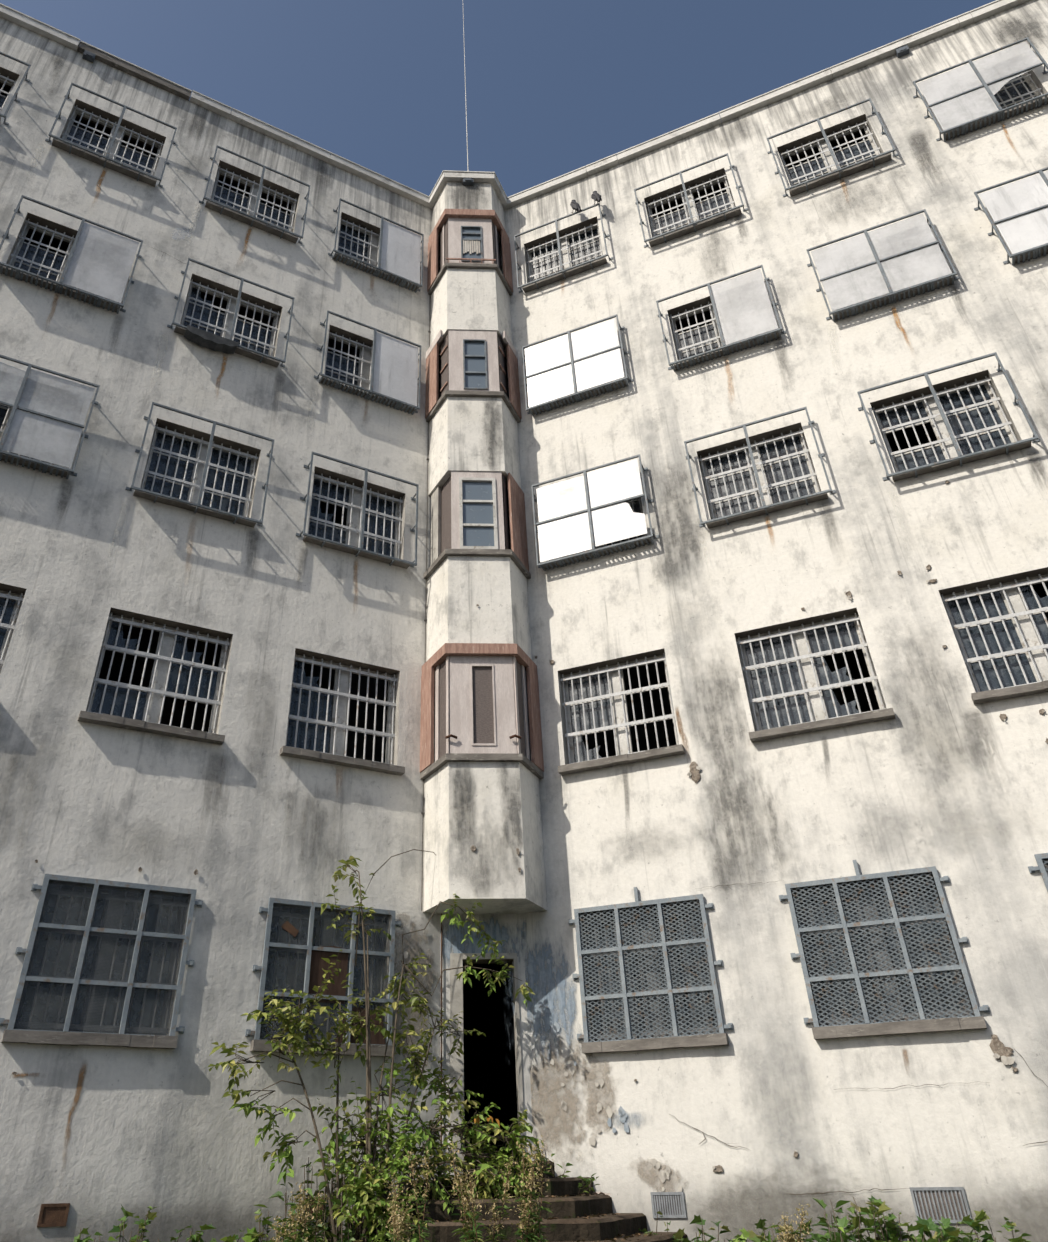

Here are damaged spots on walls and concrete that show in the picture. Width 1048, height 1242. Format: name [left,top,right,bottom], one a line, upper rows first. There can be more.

leakage [658,487,699,575]
leakage [454,769,474,839]
leakage [501,765,521,841]
leakage [716,787,750,889]
spalling [989,1034,1018,1072]
corrosion [66,1068,85,1138]
peeling [607,1106,636,1133]
crack [672,1115,751,1151]